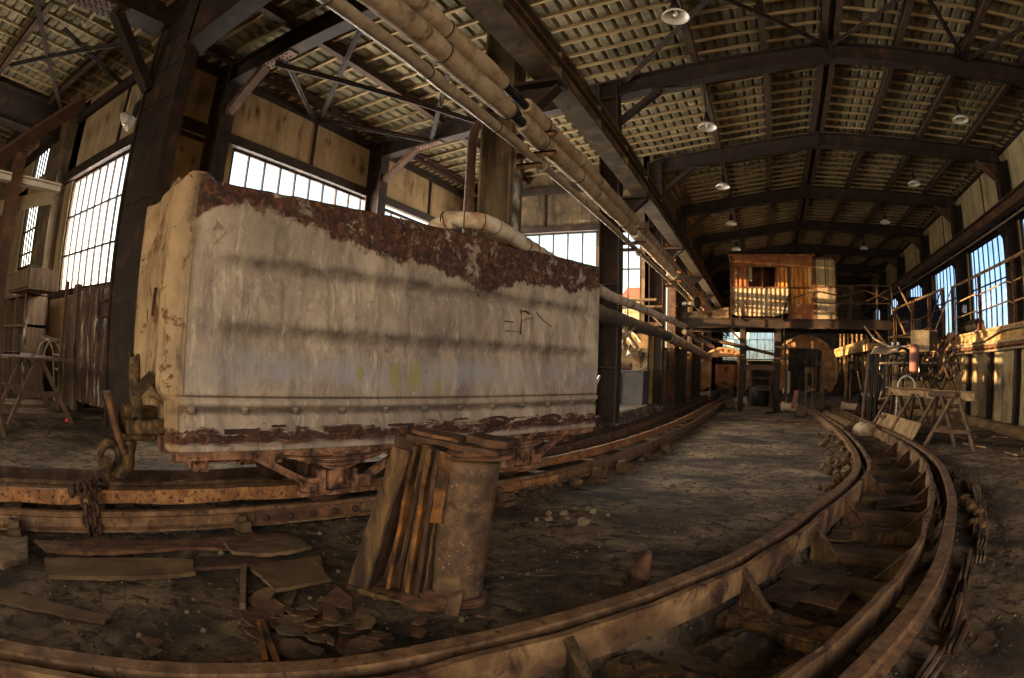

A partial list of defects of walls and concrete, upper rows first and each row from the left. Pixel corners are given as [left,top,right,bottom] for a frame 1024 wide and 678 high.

rust [220,424,310,443]
rust [324,423,415,436]